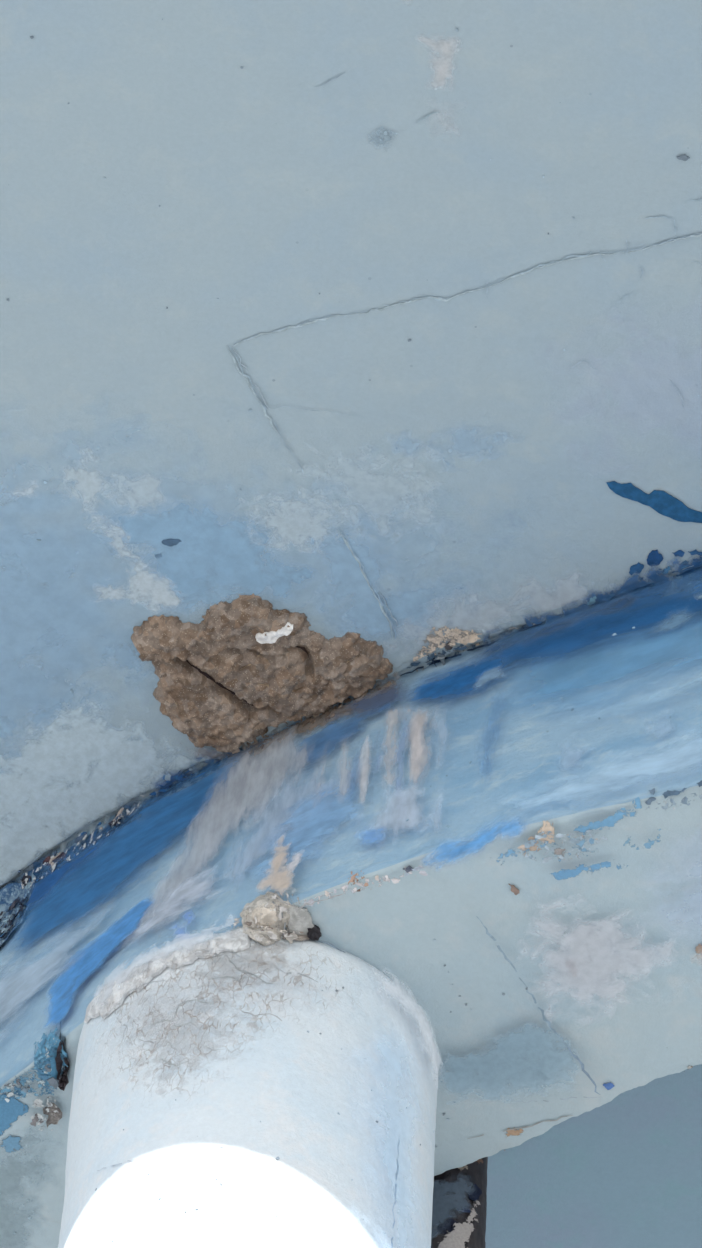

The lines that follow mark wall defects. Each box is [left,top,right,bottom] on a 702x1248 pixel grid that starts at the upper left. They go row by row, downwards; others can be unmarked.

crack [227,199,702,474]
crack [400,614,562,676]
peeling [477,669,500,686]
peeling [401,575,623,672]
crack [593,566,702,605]
peeling [629,549,702,580]
peeling [0,702,196,946]
water stain [11,559,702,1025]
crack [476,916,615,1103]
spalling [0,1027,70,1153]
spalling [500,1115,573,1151]
peeling [431,1159,483,1248]